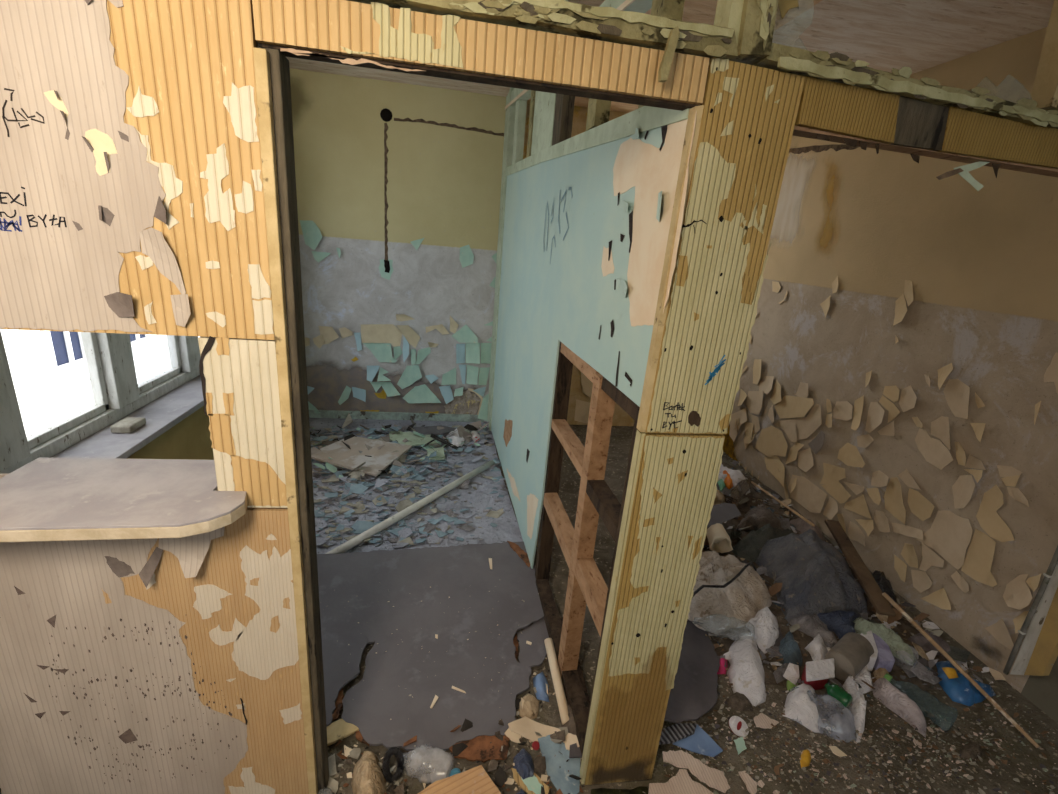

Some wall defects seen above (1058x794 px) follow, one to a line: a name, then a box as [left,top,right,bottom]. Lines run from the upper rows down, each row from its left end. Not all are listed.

peeling [807,50,1058,127]
peeling [0,0,191,332]
peeling [300,220,341,263]
peeling [820,276,839,318]
peeling [893,280,913,344]
peeling [305,314,492,421]
spalling [503,419,513,447]
spalling [507,469,539,539]
peeling [729,359,1042,650]
peeling [0,526,248,794]